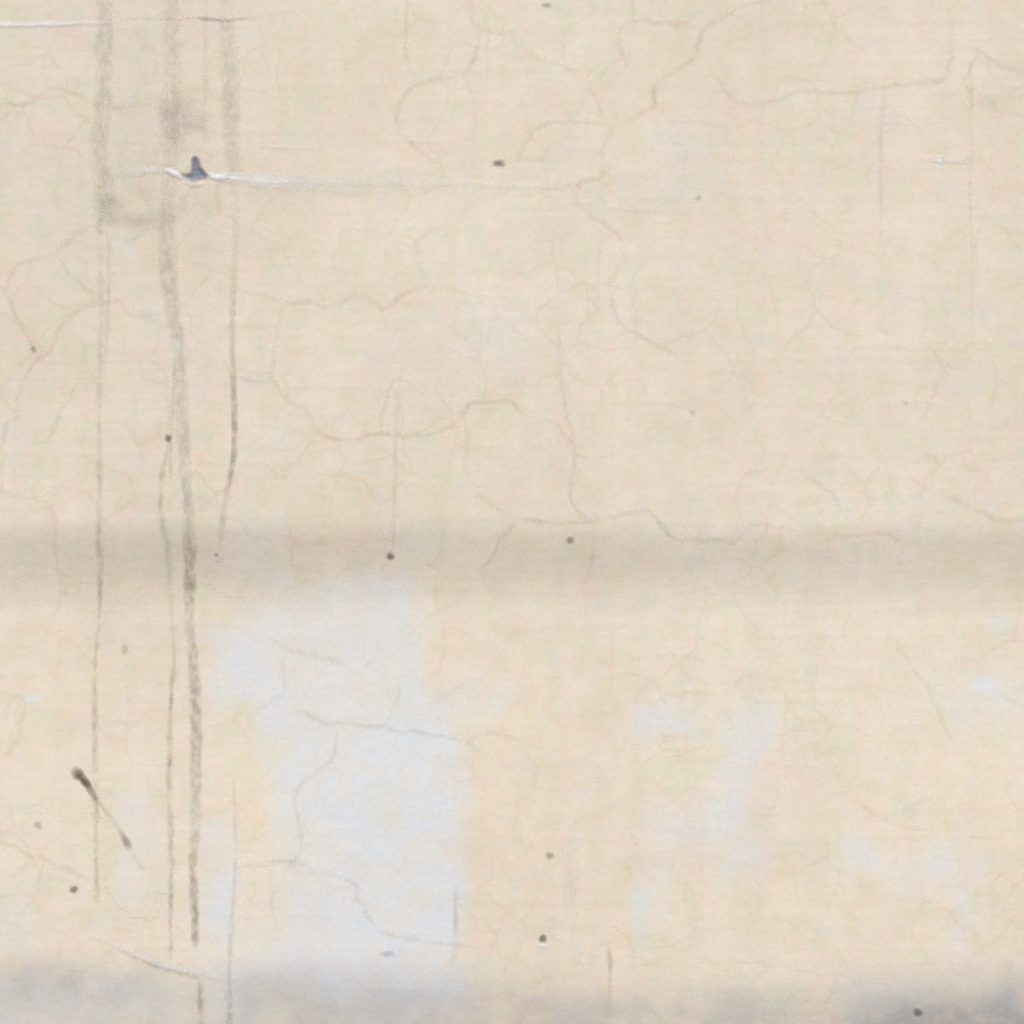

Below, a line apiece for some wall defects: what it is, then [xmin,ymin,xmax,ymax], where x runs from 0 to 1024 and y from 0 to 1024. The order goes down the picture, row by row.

crack [76,772,90,787]
damp [0,580,185,821]